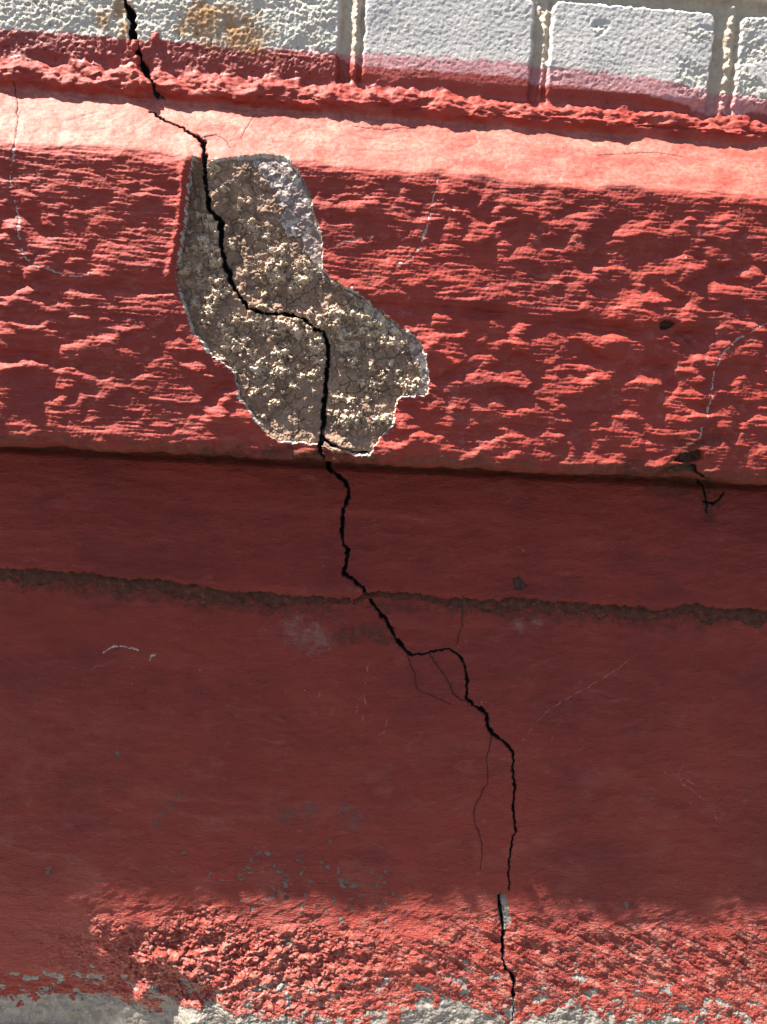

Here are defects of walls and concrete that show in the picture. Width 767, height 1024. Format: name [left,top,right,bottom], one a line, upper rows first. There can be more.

spalling [177,153,430,458]
crack [699,323,767,439]
crack [124,0,636,1021]
crack [691,464,725,513]
peeling [207,846,362,926]
peeling [496,893,511,929]
peeling [0,954,767,1024]